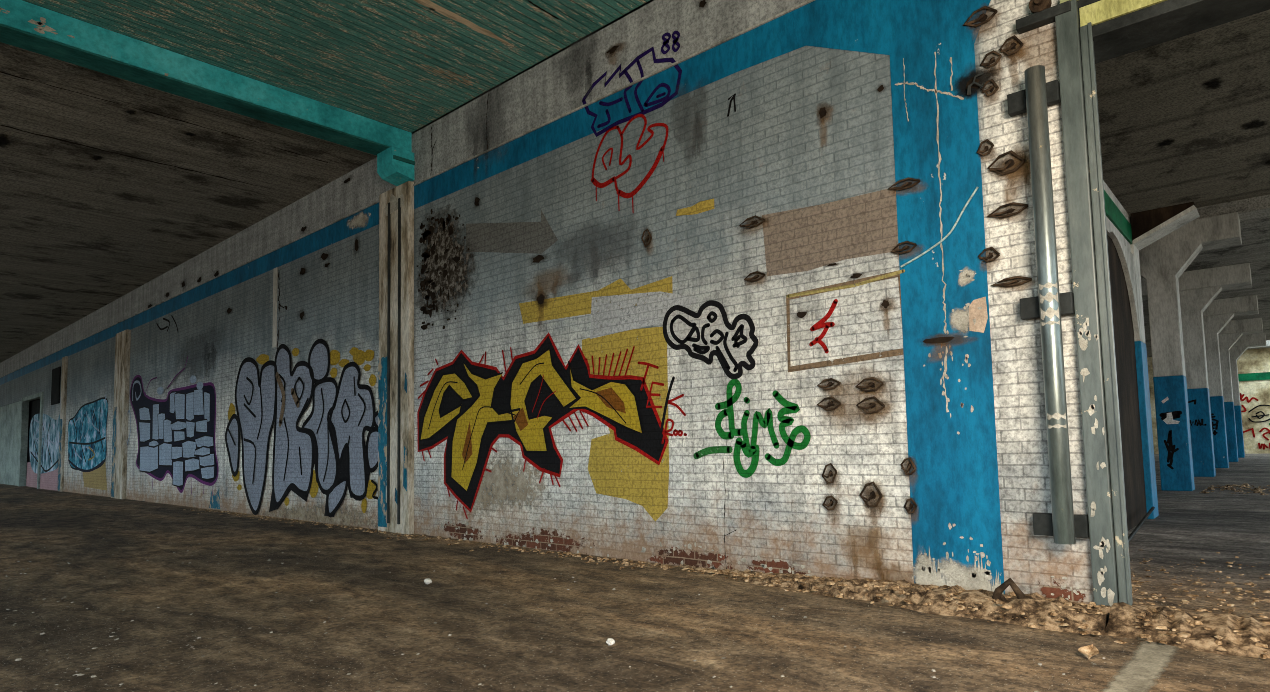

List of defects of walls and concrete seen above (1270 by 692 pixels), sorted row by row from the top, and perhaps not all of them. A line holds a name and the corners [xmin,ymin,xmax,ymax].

crack [895,52,964,412]
peeling [958,268,976,286]
peeling [923,297,988,417]
peeling [1078,318,1099,351]
peeling [1088,395,1104,435]
peeling [912,523,1004,594]